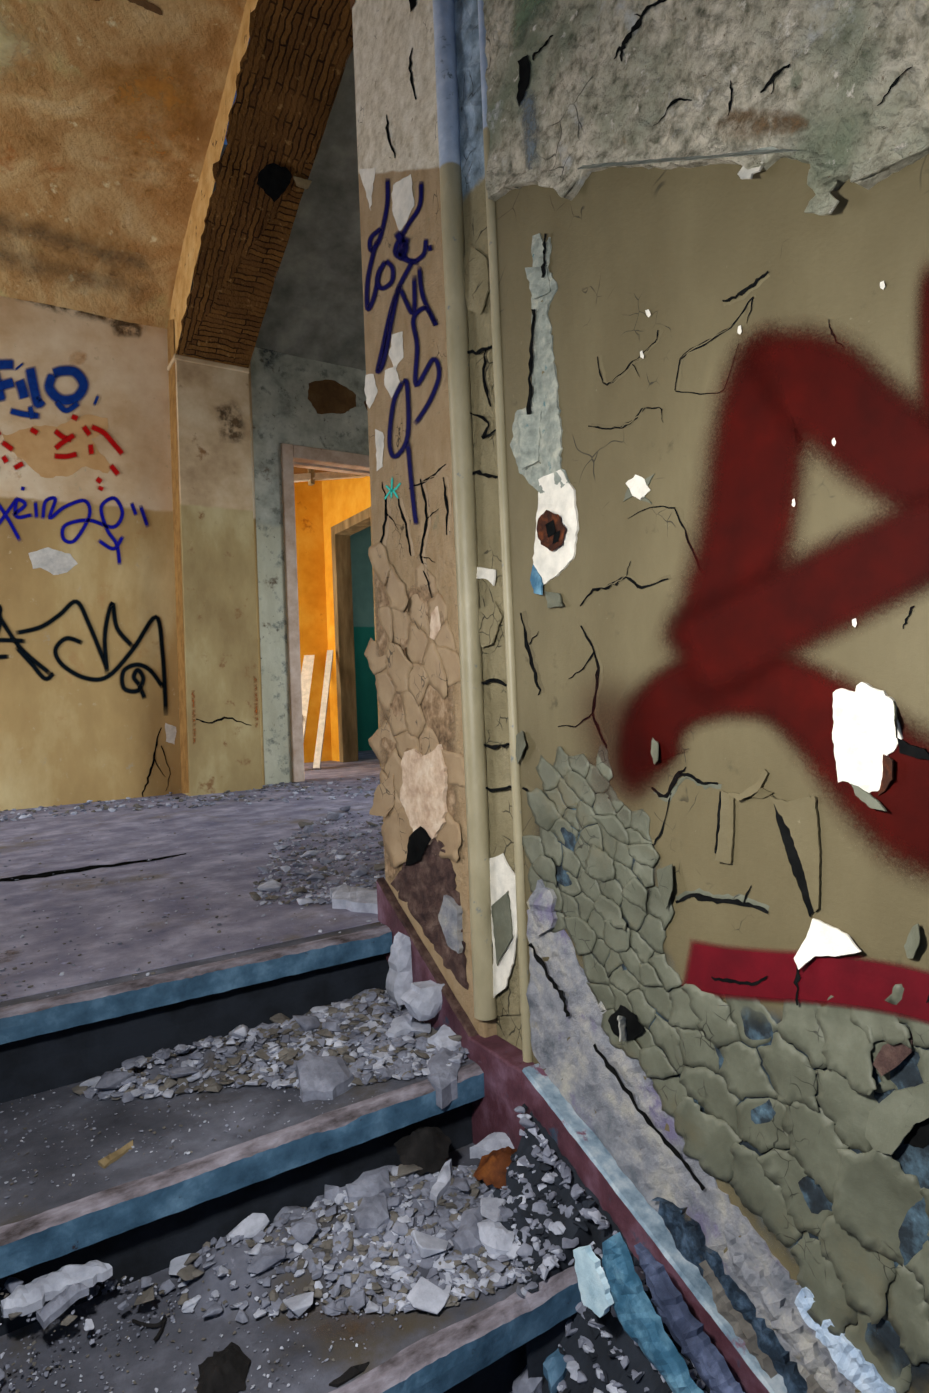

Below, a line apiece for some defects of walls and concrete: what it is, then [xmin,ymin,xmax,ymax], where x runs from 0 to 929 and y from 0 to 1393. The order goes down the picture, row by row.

crack [614,0,667,62]
flaking render [483,0,929,216]
crack [727,64,790,116]
flaking render [308,331,404,414]
flaking render [510,233,570,494]
crack [588,271,770,430]
peeling [364,543,469,990]
crack [481,506,722,846]
spalling [832,682,929,811]
crack [0,853,186,882]
crack [675,886,770,914]
peeling [490,745,929,1393]